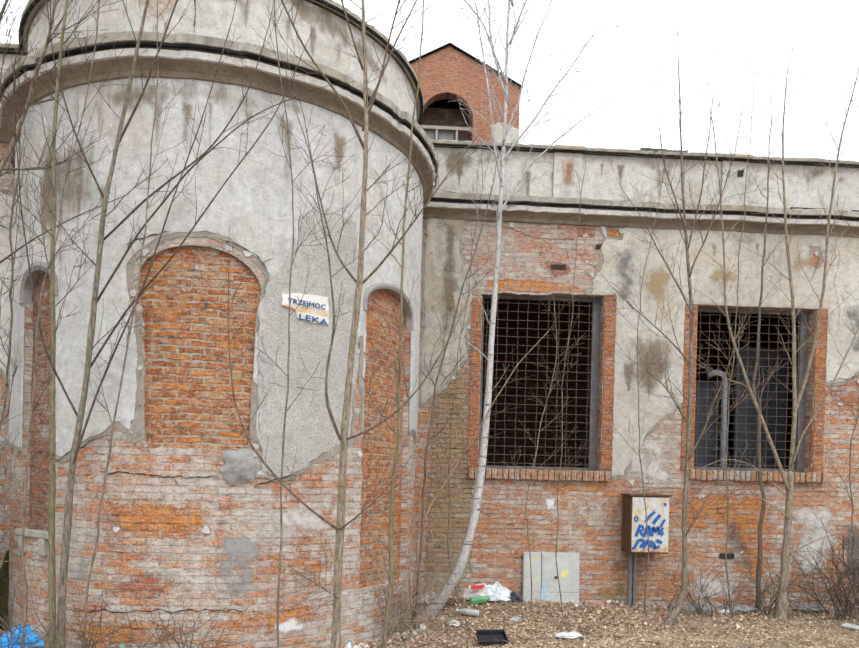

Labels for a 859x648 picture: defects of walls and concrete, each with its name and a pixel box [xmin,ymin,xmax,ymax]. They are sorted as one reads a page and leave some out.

damp [336,136,345,168]
damp [41,148,82,229]
flaking render [462,221,625,295]
damp [625,341,666,393]
flaking render [346,344,363,498]
crack [100,471,214,488]
flaking render [108,495,211,543]
spalling [103,570,190,599]
flaking render [77,619,198,648]
flaking render [224,602,319,639]